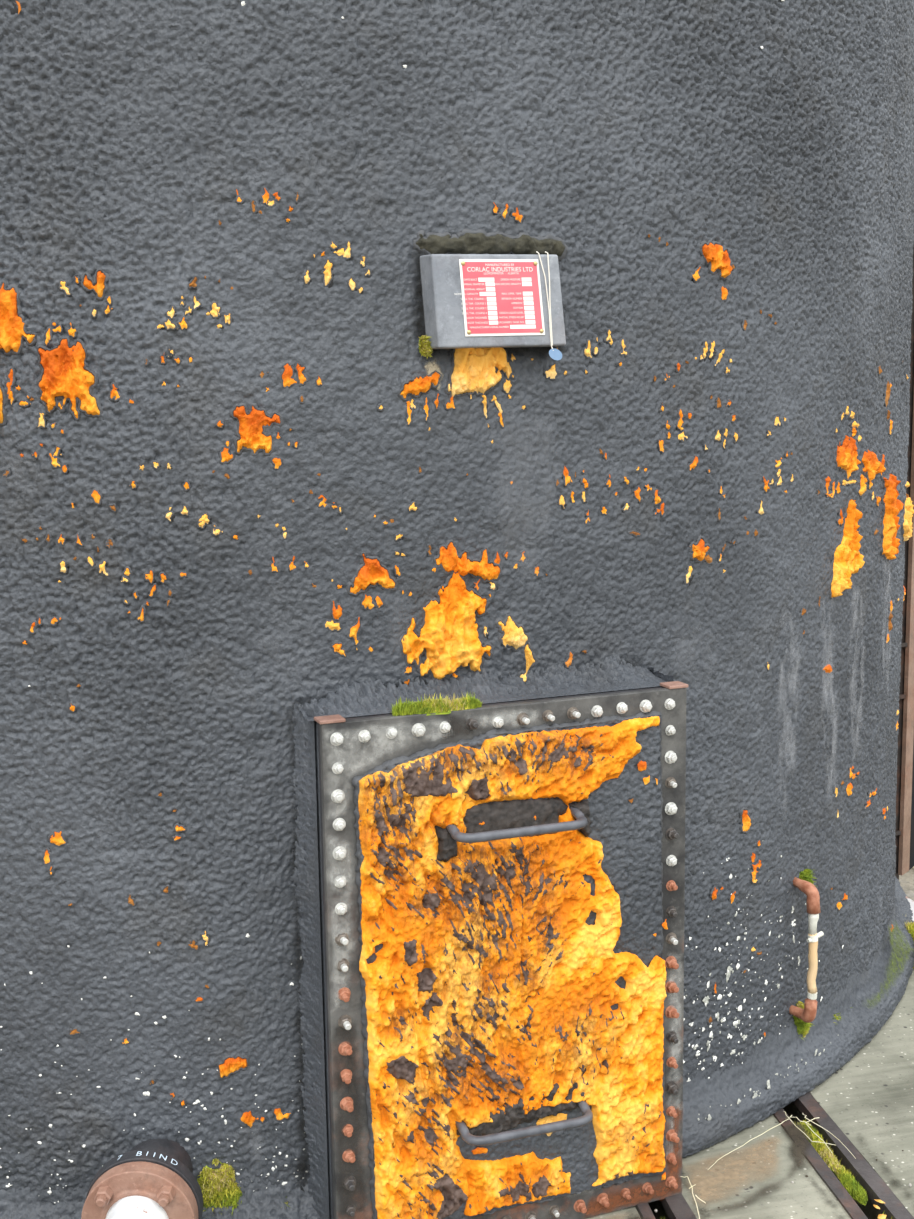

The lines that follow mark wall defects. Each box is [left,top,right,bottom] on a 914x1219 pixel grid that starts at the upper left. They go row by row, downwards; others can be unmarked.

peeling [58,268,114,318]
peeling [692,240,735,302]
peeling [0,280,134,474]
peeling [212,402,299,479]
peeling [258,362,323,404]
peeling [397,347,567,444]
peeling [164,481,238,539]
peeling [268,555,310,573]
peeling [324,515,412,658]
peeling [398,539,548,685]
peeling [800,405,914,634]
corrosion [586,1108,681,1215]